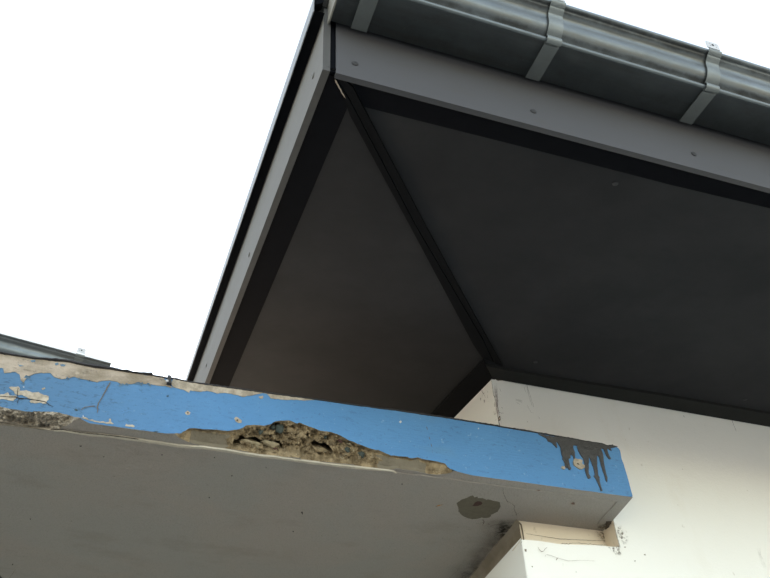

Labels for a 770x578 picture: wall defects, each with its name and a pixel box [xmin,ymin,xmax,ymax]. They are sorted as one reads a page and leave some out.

peeling [0,354,313,430]
spalling [175,417,452,475]
peeling [457,495,501,519]